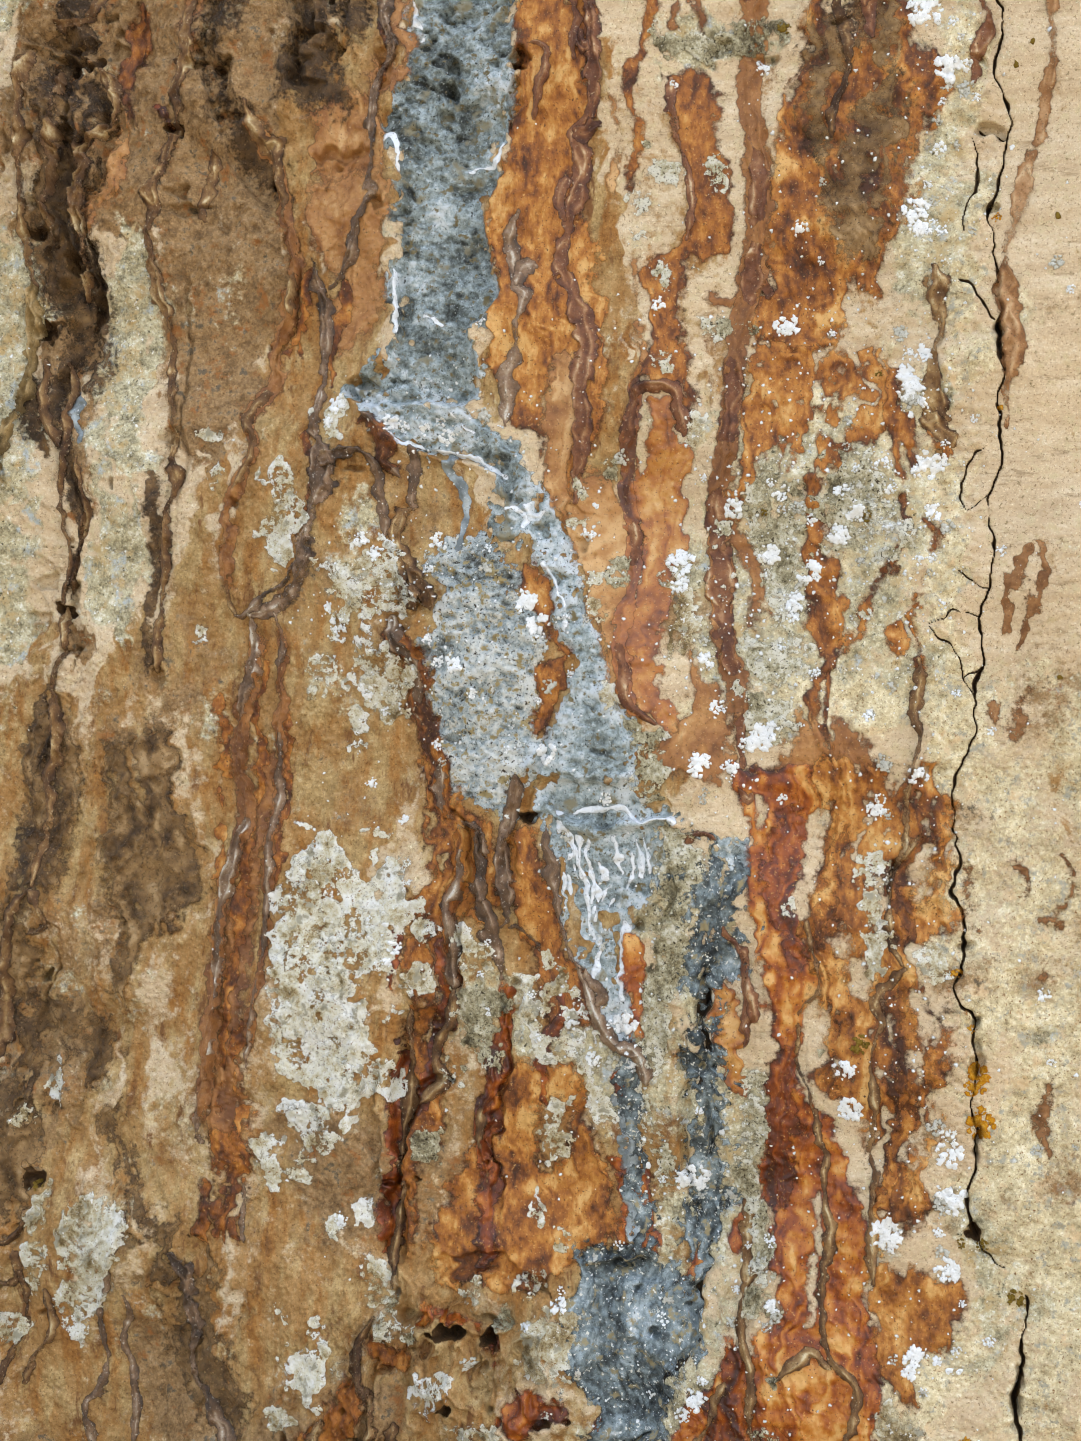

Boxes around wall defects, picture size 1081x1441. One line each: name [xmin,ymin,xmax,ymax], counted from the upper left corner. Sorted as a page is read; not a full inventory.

leakage [0,0,765,1441]
corrosion [415,1301,500,1367]
corrosion [483,0,971,1441]
leakage [704,0,776,769]
crack [929,0,1030,1441]